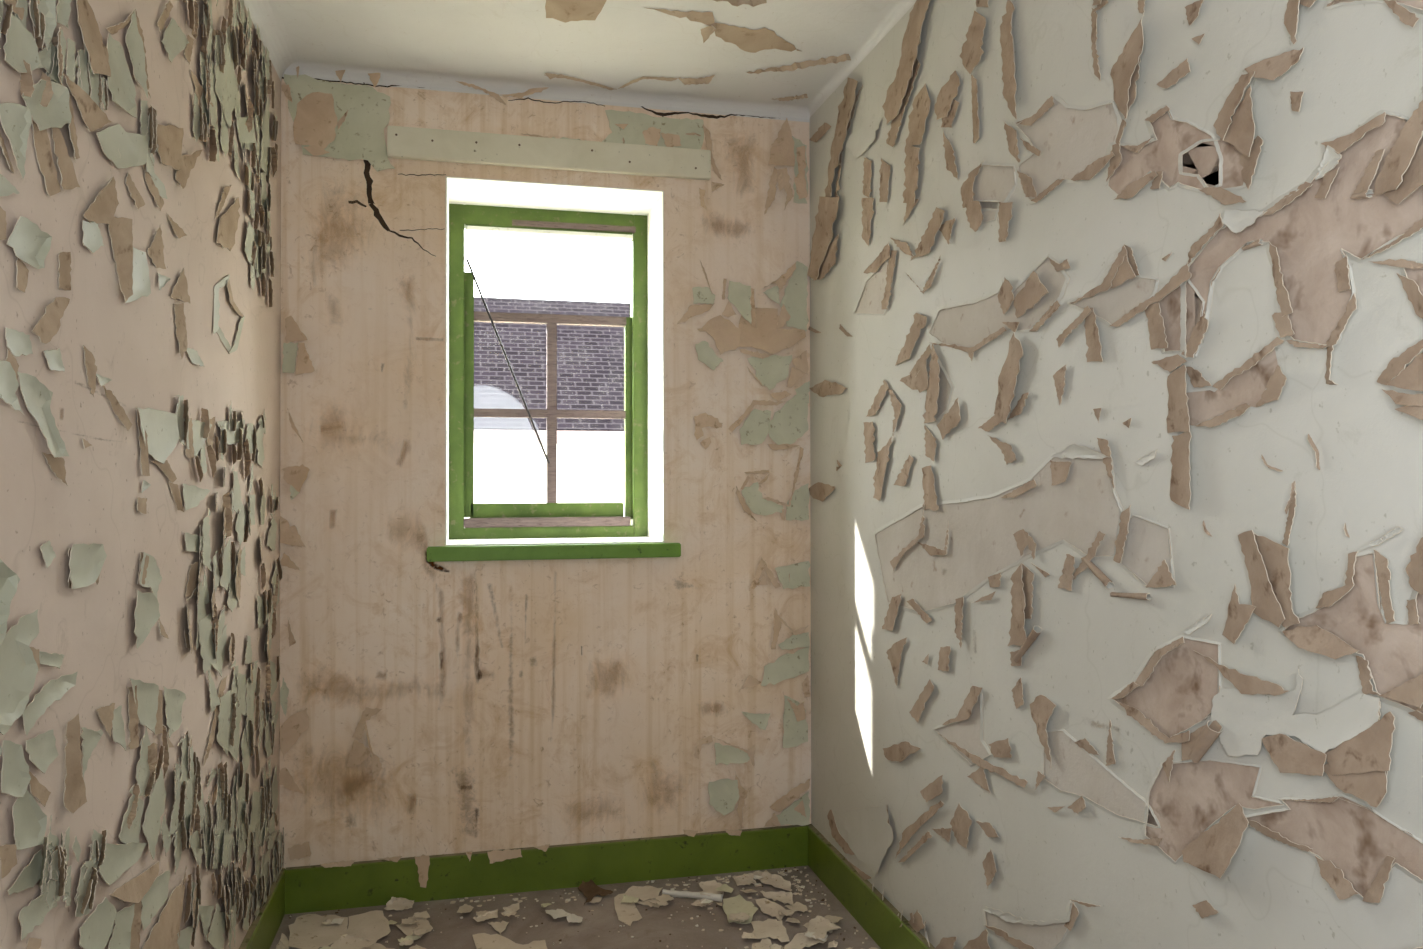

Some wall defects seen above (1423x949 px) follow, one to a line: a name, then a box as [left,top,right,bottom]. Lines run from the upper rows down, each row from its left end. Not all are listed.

peeling [643,0,851,74]
peeling [456,73,715,106]
crack [348,160,446,256]
peeling [0,0,395,486]
peeling [677,0,1423,905]
peeling [0,345,355,949]
peeling [288,910,391,949]
peeling [457,903,520,934]
peeling [541,880,674,926]
peeling [691,870,791,920]
peeling [784,916,841,949]
peeling [898,899,1100,949]